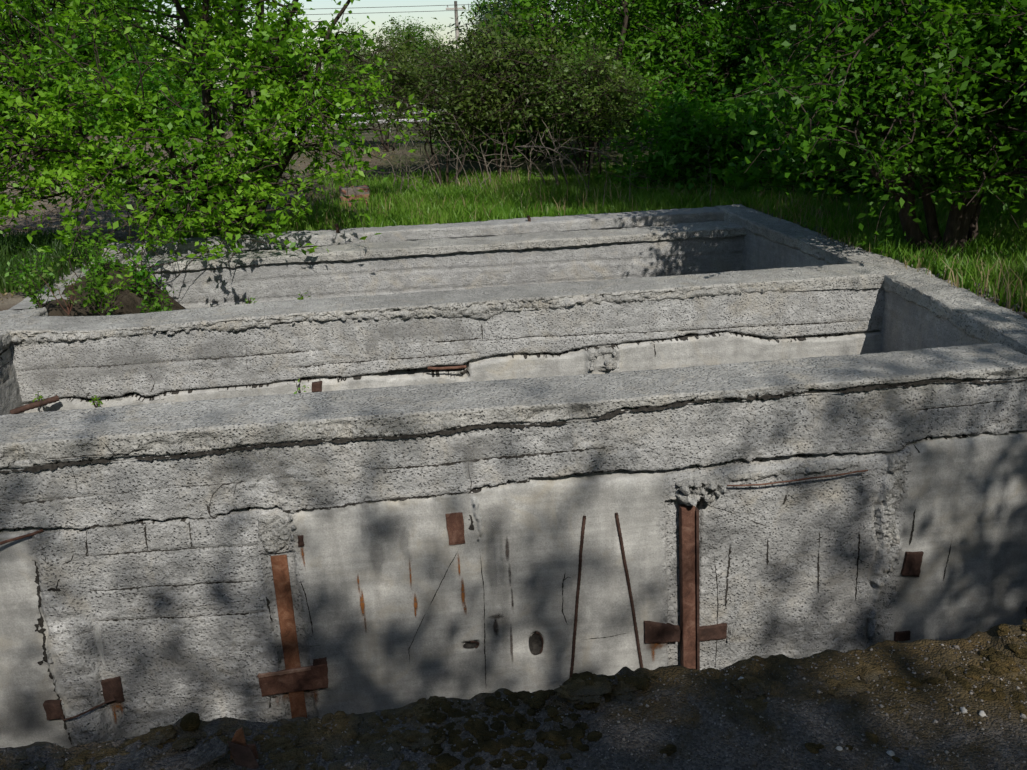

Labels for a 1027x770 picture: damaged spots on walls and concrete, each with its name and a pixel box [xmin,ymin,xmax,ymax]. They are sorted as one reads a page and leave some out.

crack [0,320,865,402]
corrosion [458,555,467,612]
crack [0,379,1027,745]
spalling [875,452,909,593]